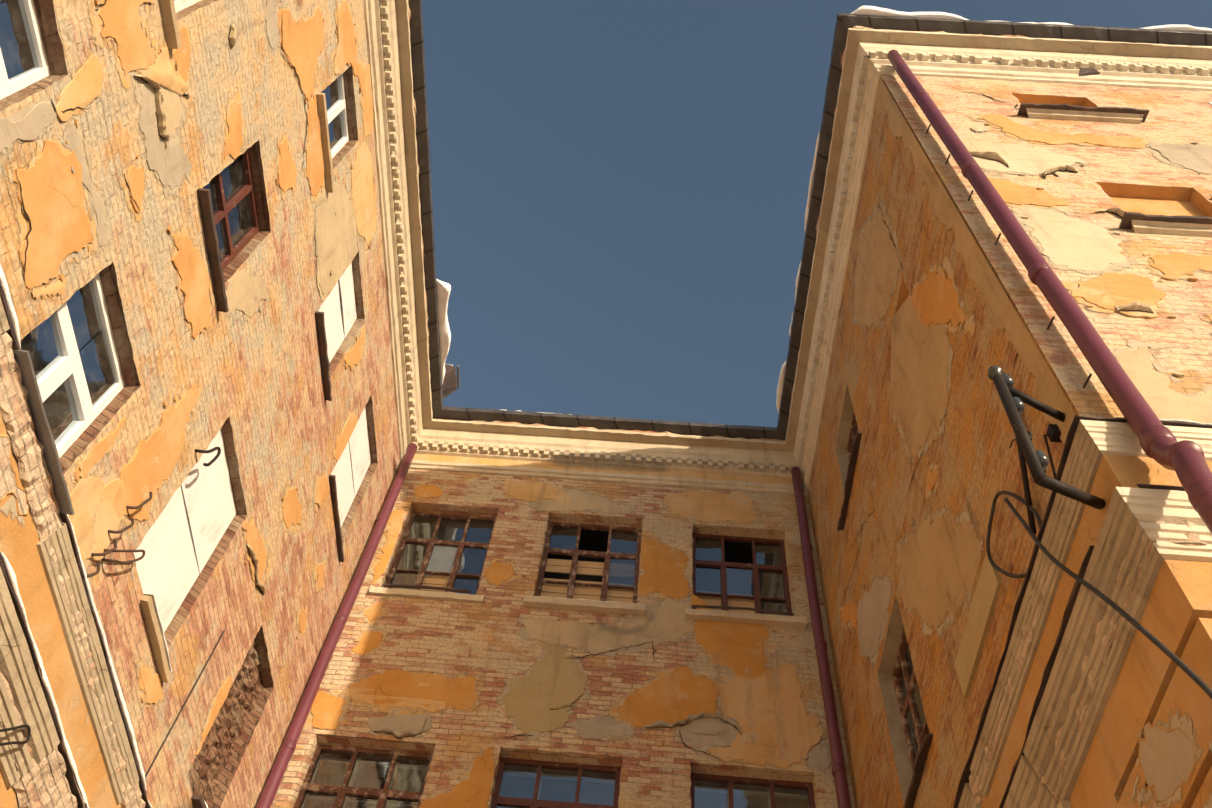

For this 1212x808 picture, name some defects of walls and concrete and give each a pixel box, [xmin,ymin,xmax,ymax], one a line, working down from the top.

peeling [0,0,192,300]
peeling [957,113,1212,319]
peeling [167,221,270,340]
peeling [67,378,201,572]
peeling [501,479,635,515]
peeling [662,488,763,525]
peeling [303,483,480,739]
peeling [484,557,523,588]
peeling [496,536,831,775]
peeling [420,740,499,808]
flaking render [1131,709,1212,808]